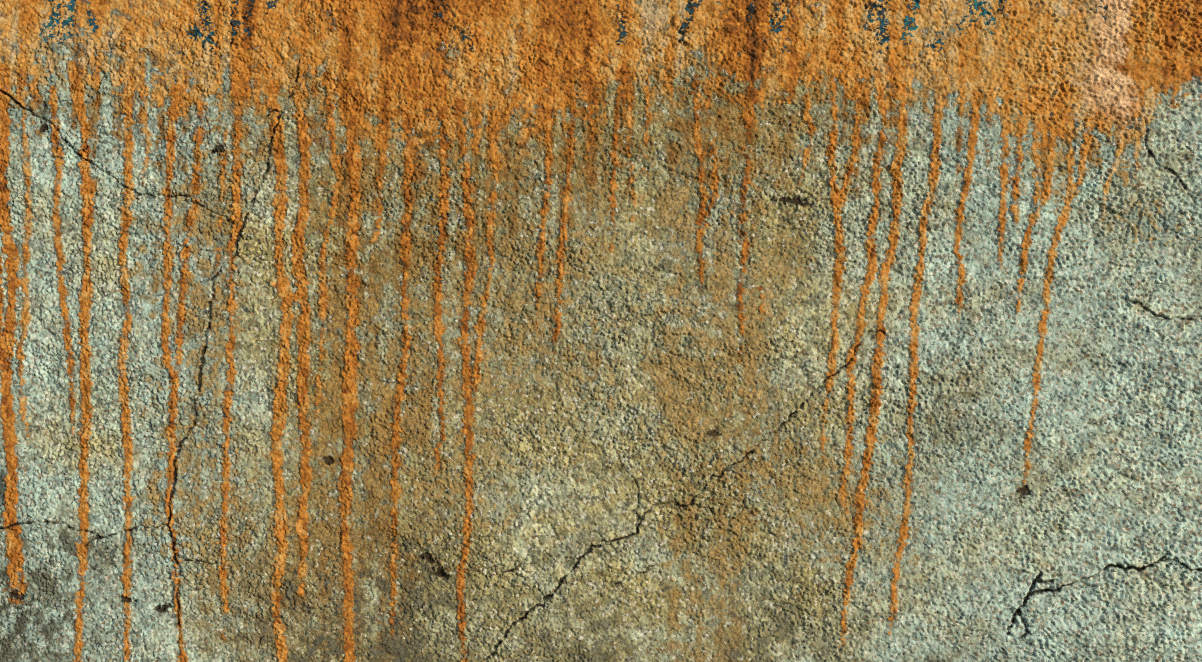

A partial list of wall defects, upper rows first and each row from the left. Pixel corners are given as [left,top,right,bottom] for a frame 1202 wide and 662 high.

corrosion [15,297,31,391]
corrosion [22,160,33,272]
crack [0,65,299,643]
corrosion [174,198,199,365]
corrosion [703,142,769,273]
corrosion [823,123,848,412]
corrosion [998,161,1020,268]
crack [1130,300,1201,321]
corrosion [217,275,237,613]
corrosion [269,280,314,662]
crack [466,330,886,662]
crack [1007,556,1202,638]